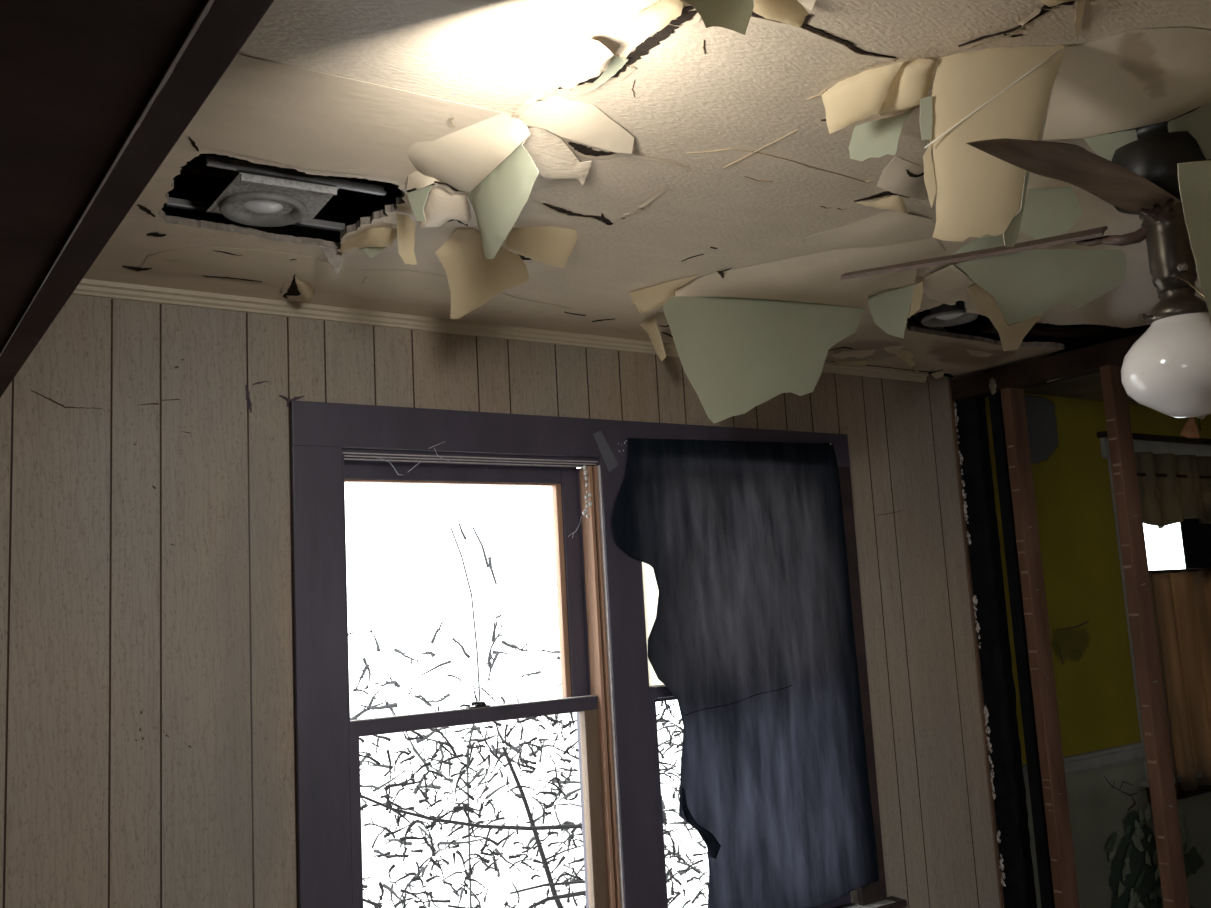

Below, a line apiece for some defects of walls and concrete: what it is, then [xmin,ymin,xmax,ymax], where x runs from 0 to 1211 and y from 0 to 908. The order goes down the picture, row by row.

peeling [550,39,629,98]
crack [510,6,705,118]
peeling [622,0,809,40]
crack [750,11,896,62]
crack [958,0,1107,50]
peeling [320,127,592,319]
crack [539,90,924,228]
peeling [822,0,1126,351]
peeling [1084,129,1138,161]
peeling [1168,103,1211,318]
peeling [629,275,923,423]
peeling [1106,802,1164,908]